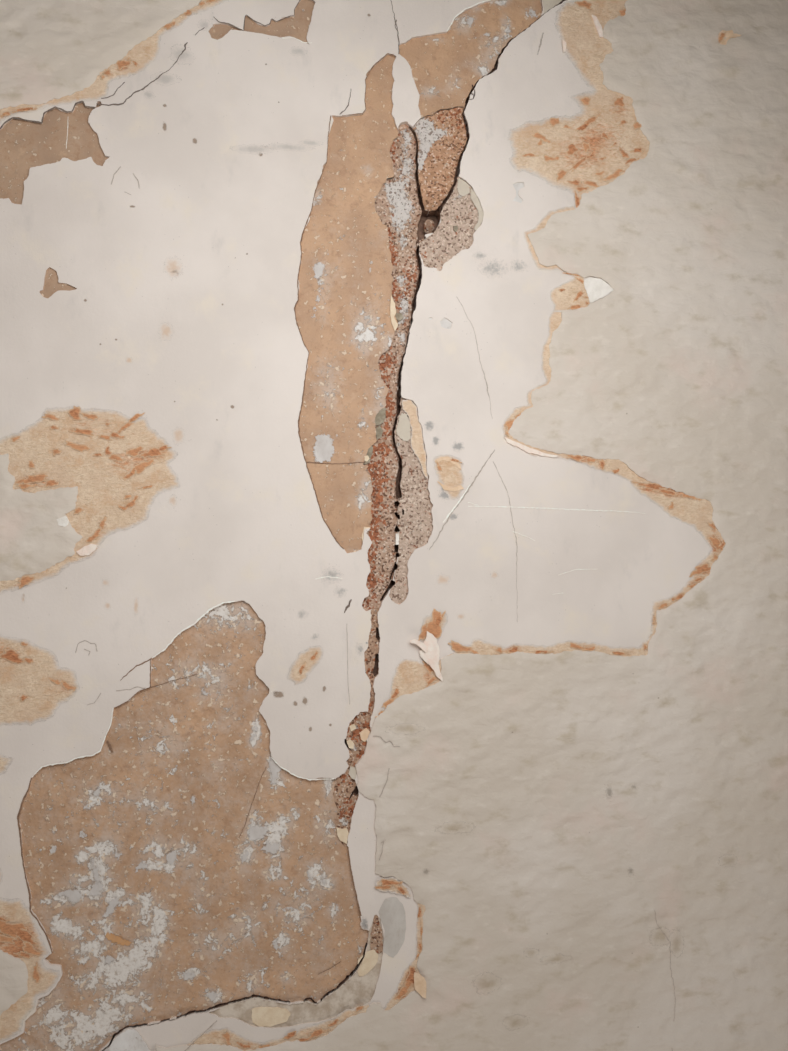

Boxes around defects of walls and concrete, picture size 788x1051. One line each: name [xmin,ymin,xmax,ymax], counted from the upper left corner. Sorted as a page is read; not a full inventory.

peeling [0,0,543,1051]
crack [349,736,400,800]
crack [372,627,380,676]
crack [381,0,566,600]